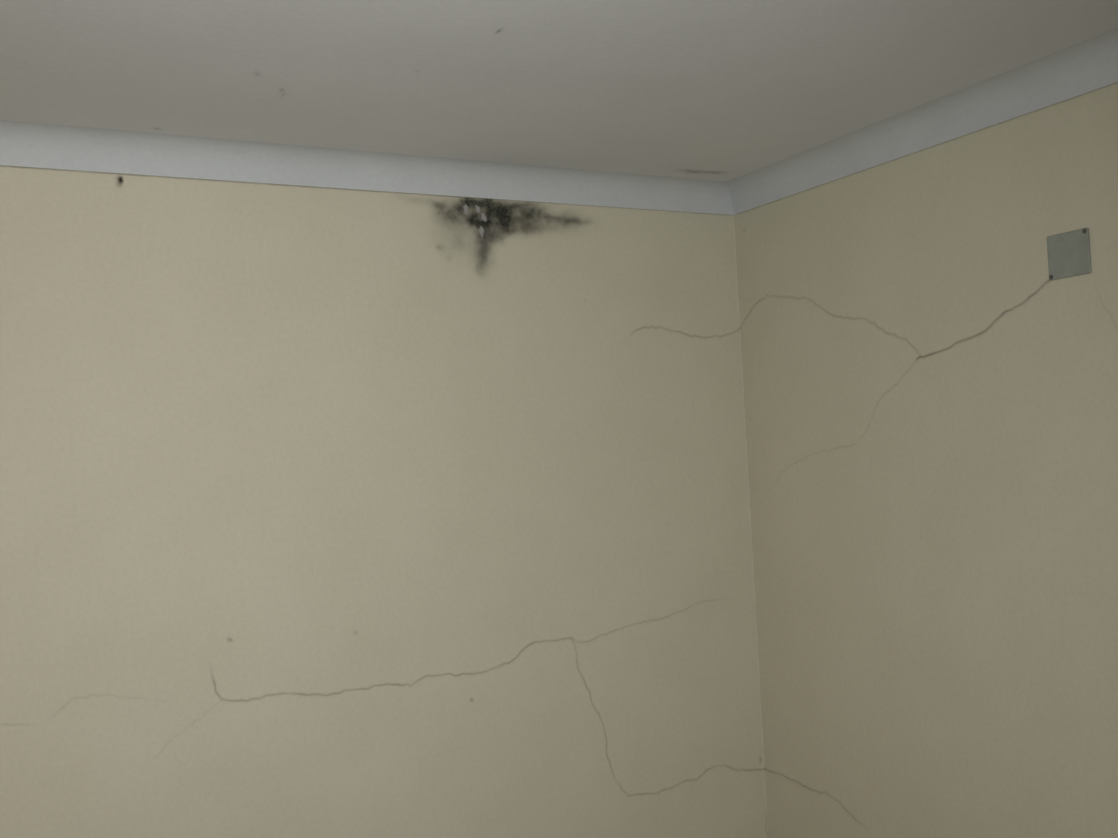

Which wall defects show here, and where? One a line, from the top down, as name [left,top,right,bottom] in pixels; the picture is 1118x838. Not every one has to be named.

damp [457,198,531,237]